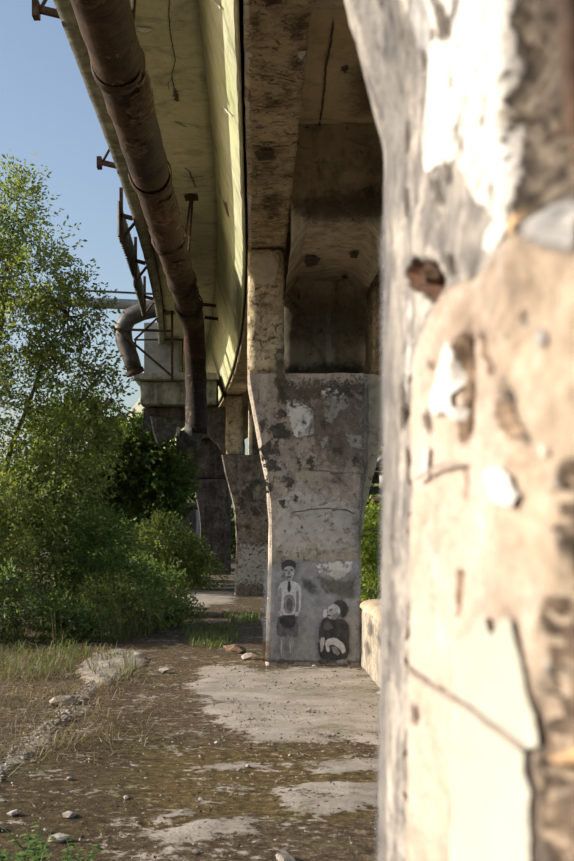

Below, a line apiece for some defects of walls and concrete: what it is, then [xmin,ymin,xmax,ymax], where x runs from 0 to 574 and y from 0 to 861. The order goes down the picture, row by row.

peeling [403,0,574,255]
peeling [235,388,364,587]
flaking render [421,331,494,445]
flaking render [483,464,517,508]